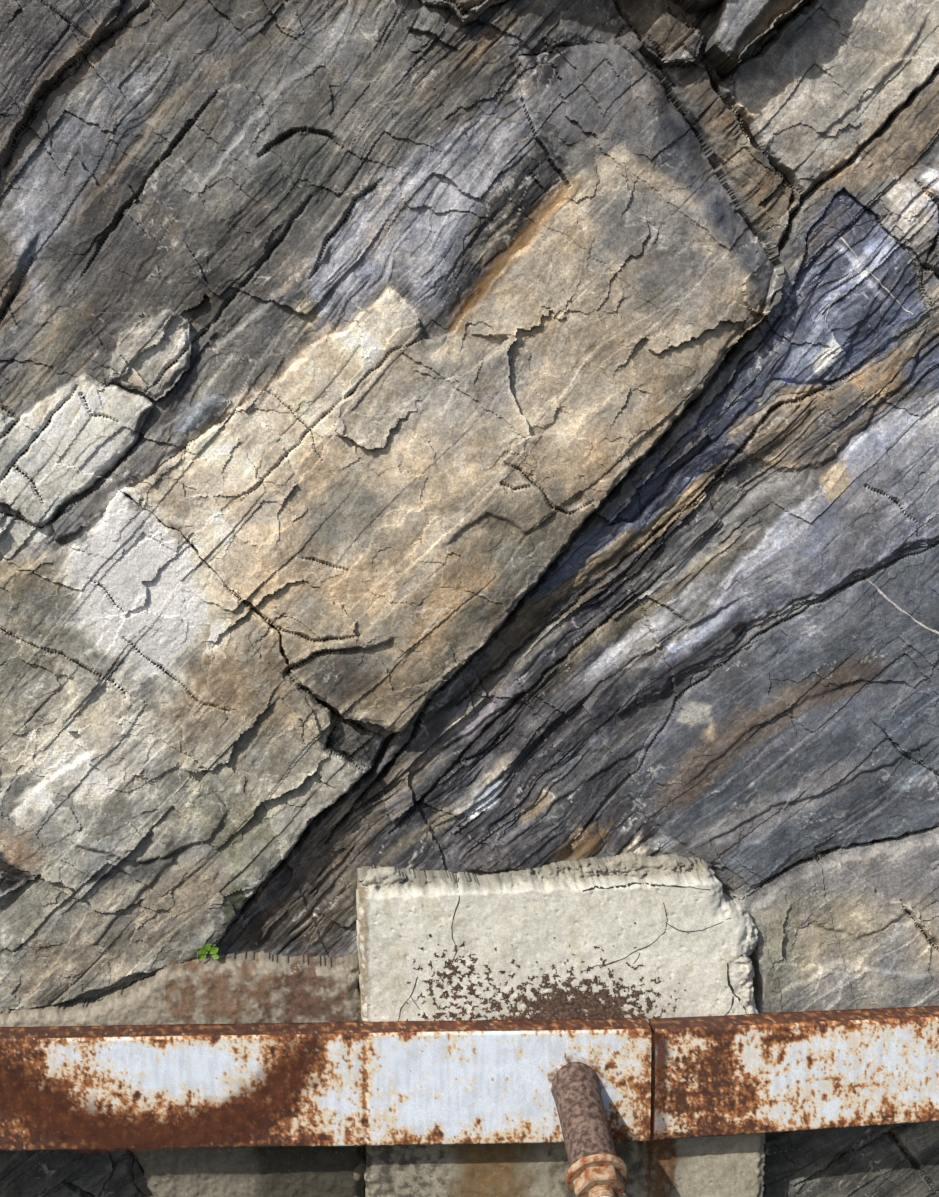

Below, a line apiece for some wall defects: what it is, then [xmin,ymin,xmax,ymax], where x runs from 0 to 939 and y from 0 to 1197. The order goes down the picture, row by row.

rust [0,1042,307,1149]
rust [638,1033,676,1197]
rust [460,1143,527,1197]